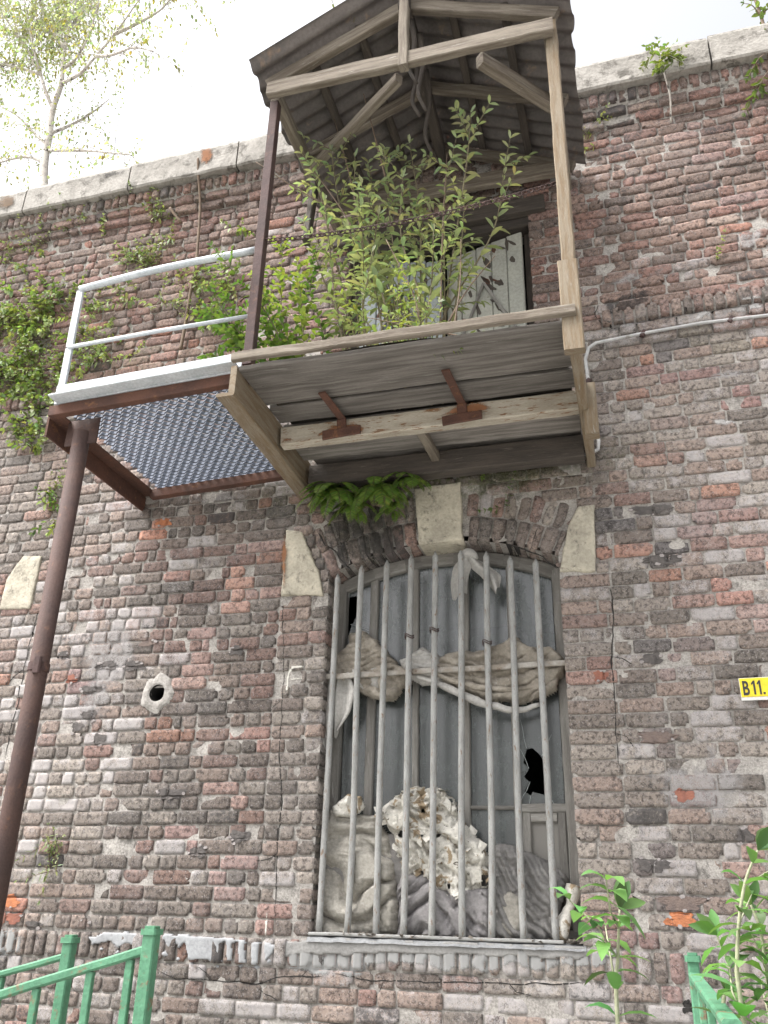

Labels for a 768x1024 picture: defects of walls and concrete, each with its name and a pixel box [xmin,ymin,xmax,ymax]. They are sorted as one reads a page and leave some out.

crack [610,589,634,767]
peeling [78,919,143,954]
peeling [162,934,275,969]